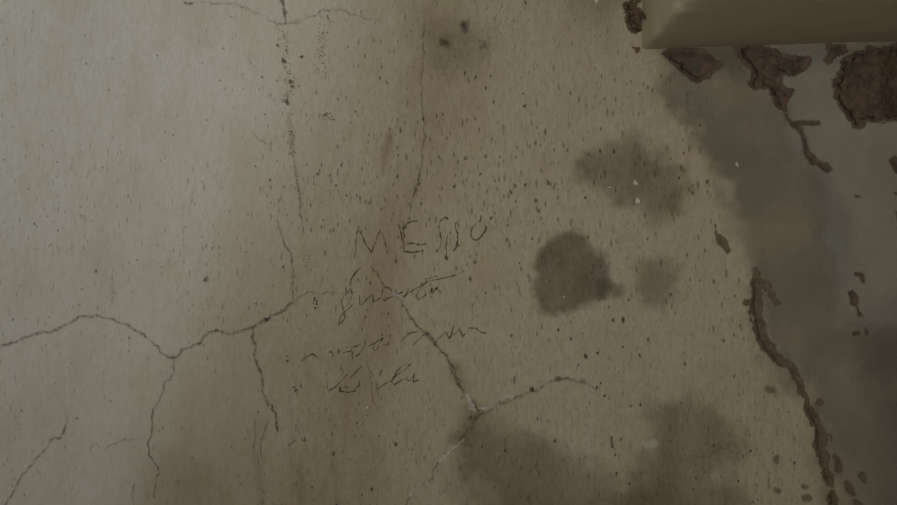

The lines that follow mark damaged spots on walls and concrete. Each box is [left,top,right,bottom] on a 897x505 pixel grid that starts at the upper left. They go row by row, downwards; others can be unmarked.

crack [276,0,308,236]
flaking render [661,47,723,83]
flaking render [733,45,812,111]
flaking render [823,41,897,130]
crack [465,388,532,412]